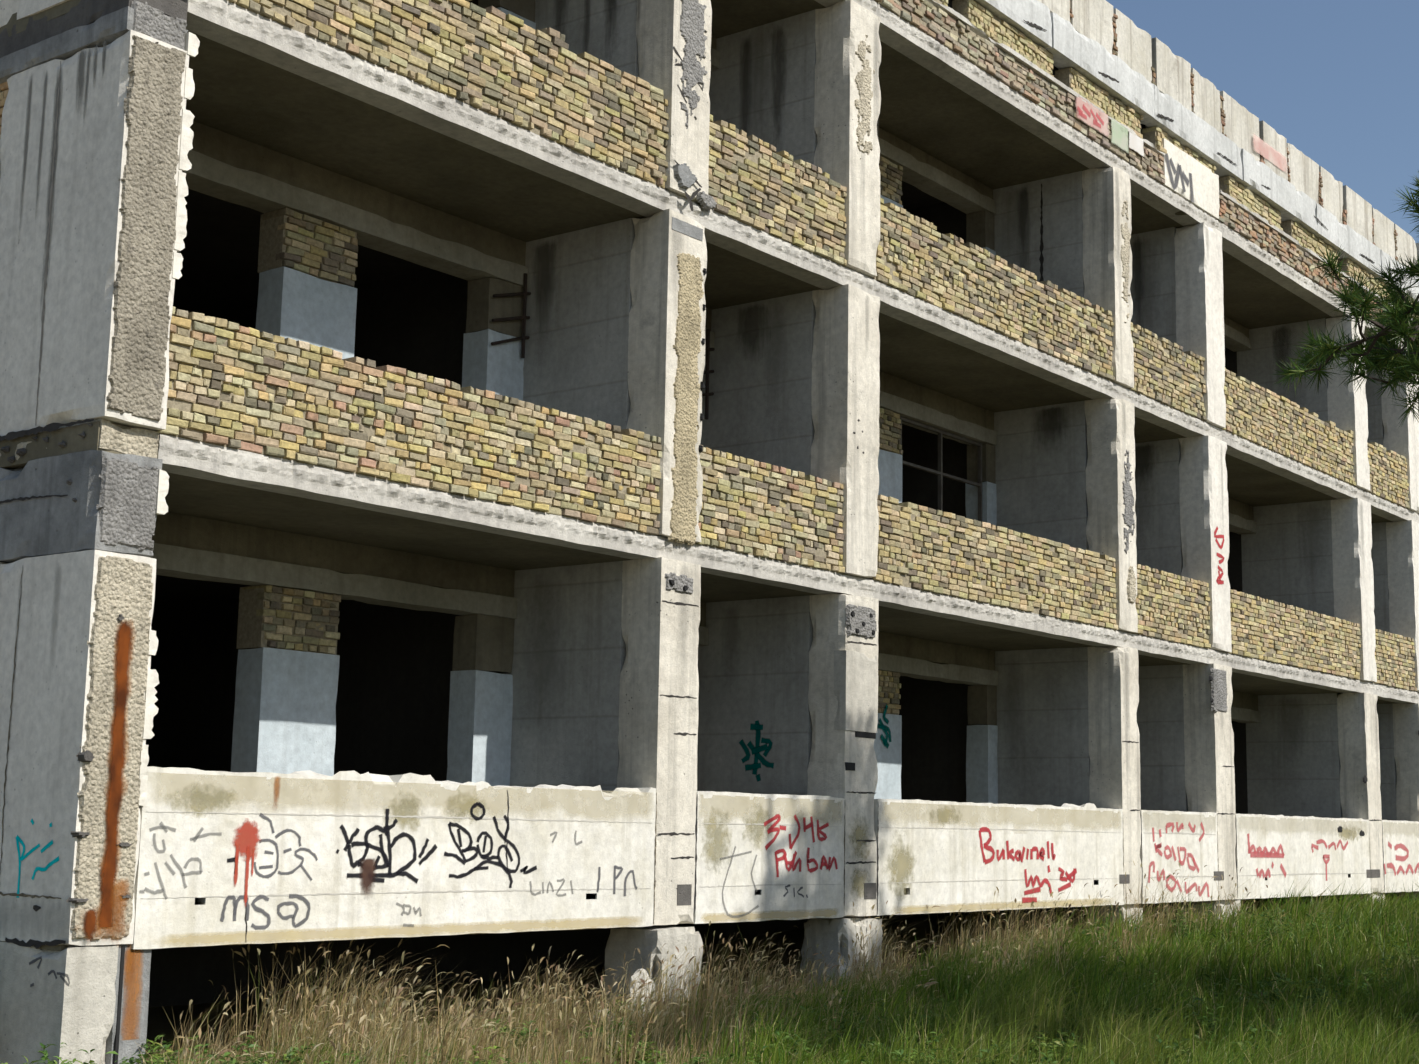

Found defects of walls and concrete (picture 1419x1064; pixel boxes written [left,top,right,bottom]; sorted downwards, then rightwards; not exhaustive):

spalling [104,0,200,421]
spalling [675,0,707,129]
spalling [855,35,875,159]
spalling [668,253,707,546]
rust [85,622,132,941]
spalling [66,456,169,940]
rust [124,949,141,1040]